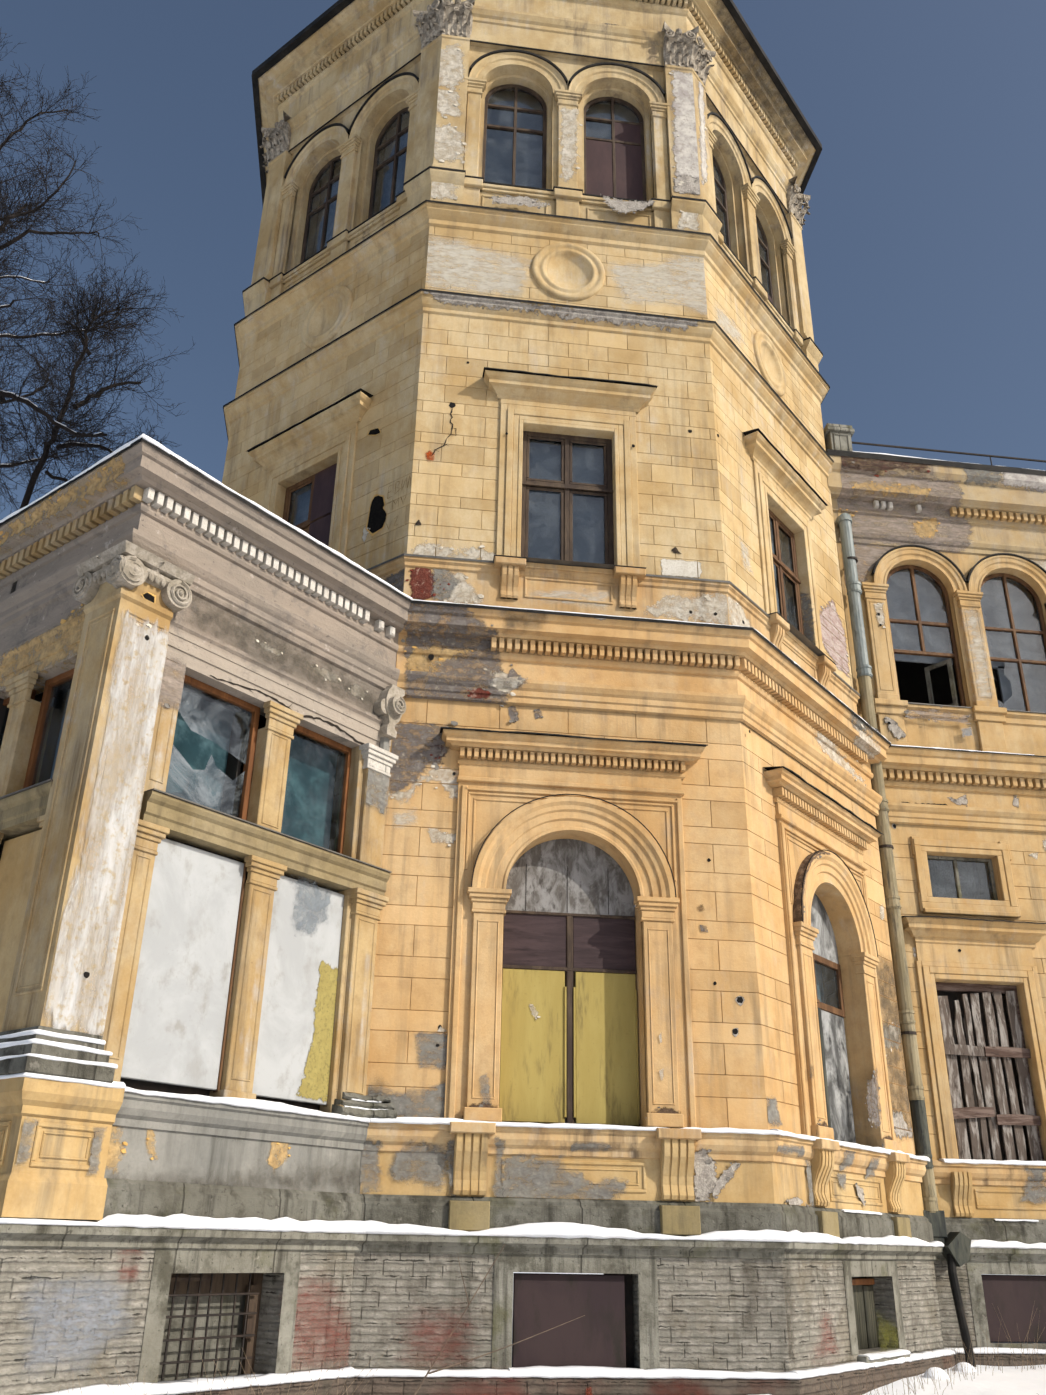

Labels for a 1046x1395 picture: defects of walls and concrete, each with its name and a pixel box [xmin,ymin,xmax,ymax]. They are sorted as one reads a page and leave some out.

peeling [669,70,708,231]
peeling [661,547,702,578]
peeling [0,603,85,694]
flaking render [384,520,543,723]
peeling [647,593,750,627]
flaking render [819,600,850,678]
flaking render [366,721,458,824]
peeling [45,610,187,1035]
peeling [428,828,456,847]
water stain [876,965,912,1126]
flaking render [865,1103,913,1148]